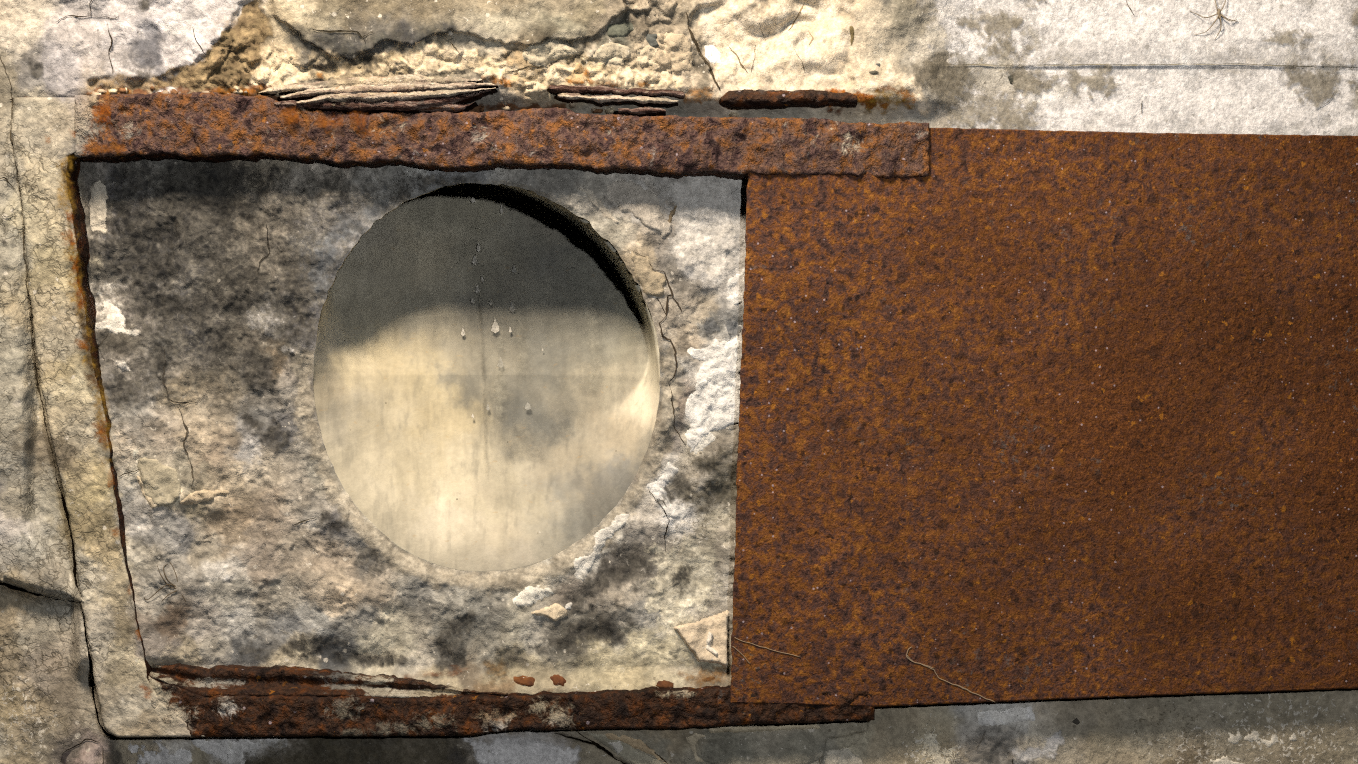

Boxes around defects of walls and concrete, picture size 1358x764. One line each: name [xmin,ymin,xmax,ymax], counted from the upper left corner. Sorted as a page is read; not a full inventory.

rust [828,86,915,114]
water stain [915,60,971,105]
water stain [626,176,748,297]
mould [700,317,741,335]
crack [0,57,186,762]
crack [162,351,205,489]
mould [659,448,737,512]
water stain [609,536,728,674]
rust [484,661,566,687]
rust [656,667,725,688]
crack [555,731,668,764]
water stain [978,728,1065,764]